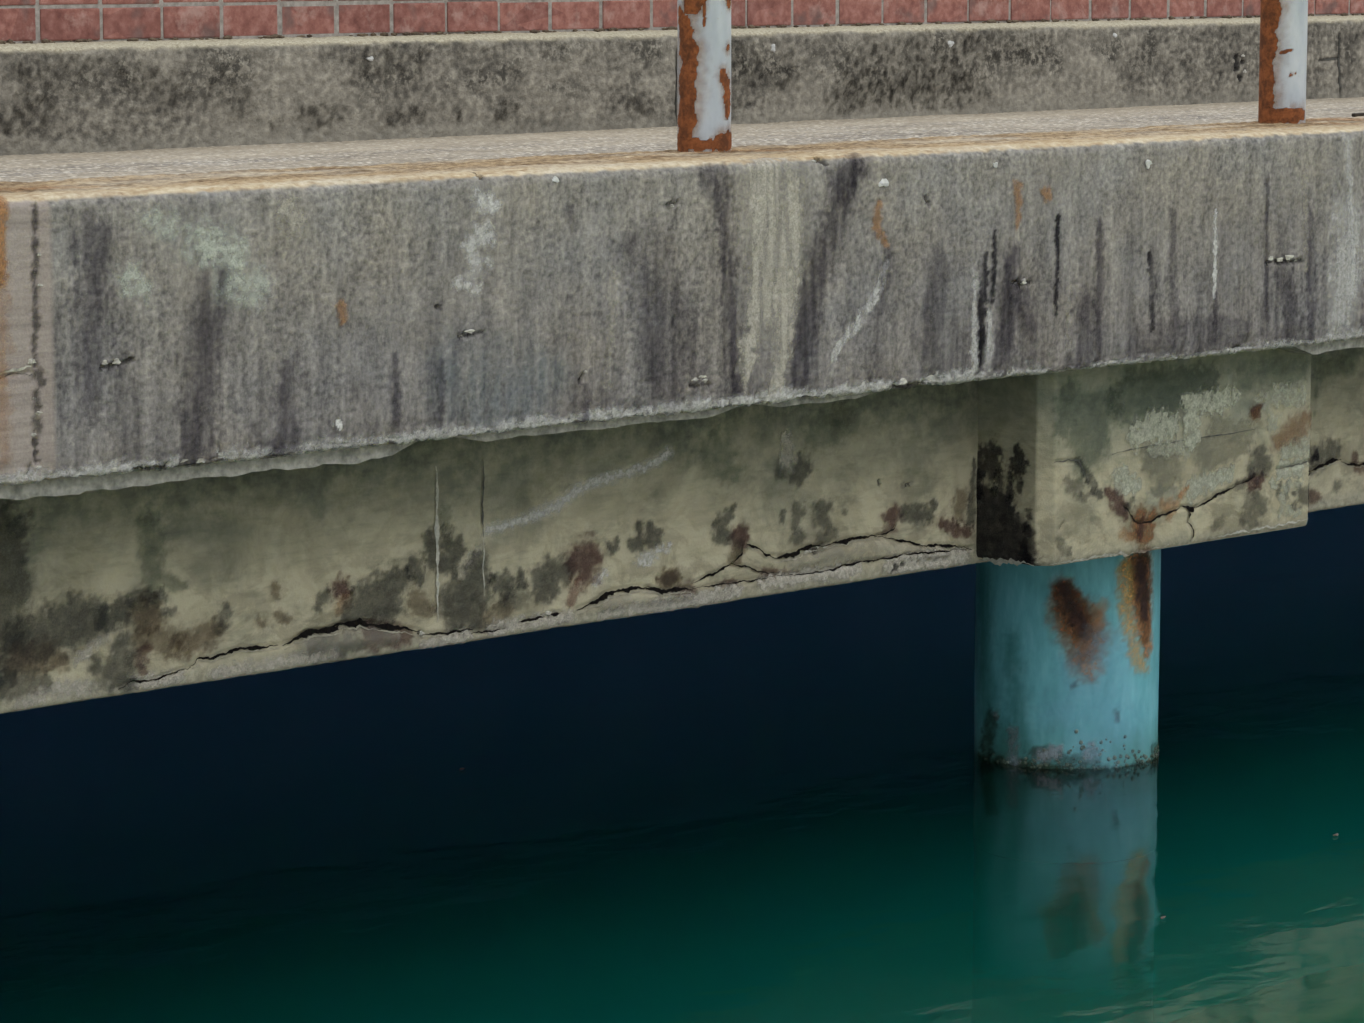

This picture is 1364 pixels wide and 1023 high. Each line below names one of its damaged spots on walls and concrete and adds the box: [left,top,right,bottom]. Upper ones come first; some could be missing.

corrosion [677,0,735,153]
corrosion [1258,0,1355,124]
corrosion [0,188,32,284]
leakage [328,158,901,449]
leakage [919,182,1364,385]
leakage [883,444,1030,574]
crack [1123,458,1364,538]
leakage [420,582,579,649]
crack [118,526,972,690]
leakage [598,561,862,620]
corrosion [1052,580,1107,687]
corrosion [1119,485,1189,669]